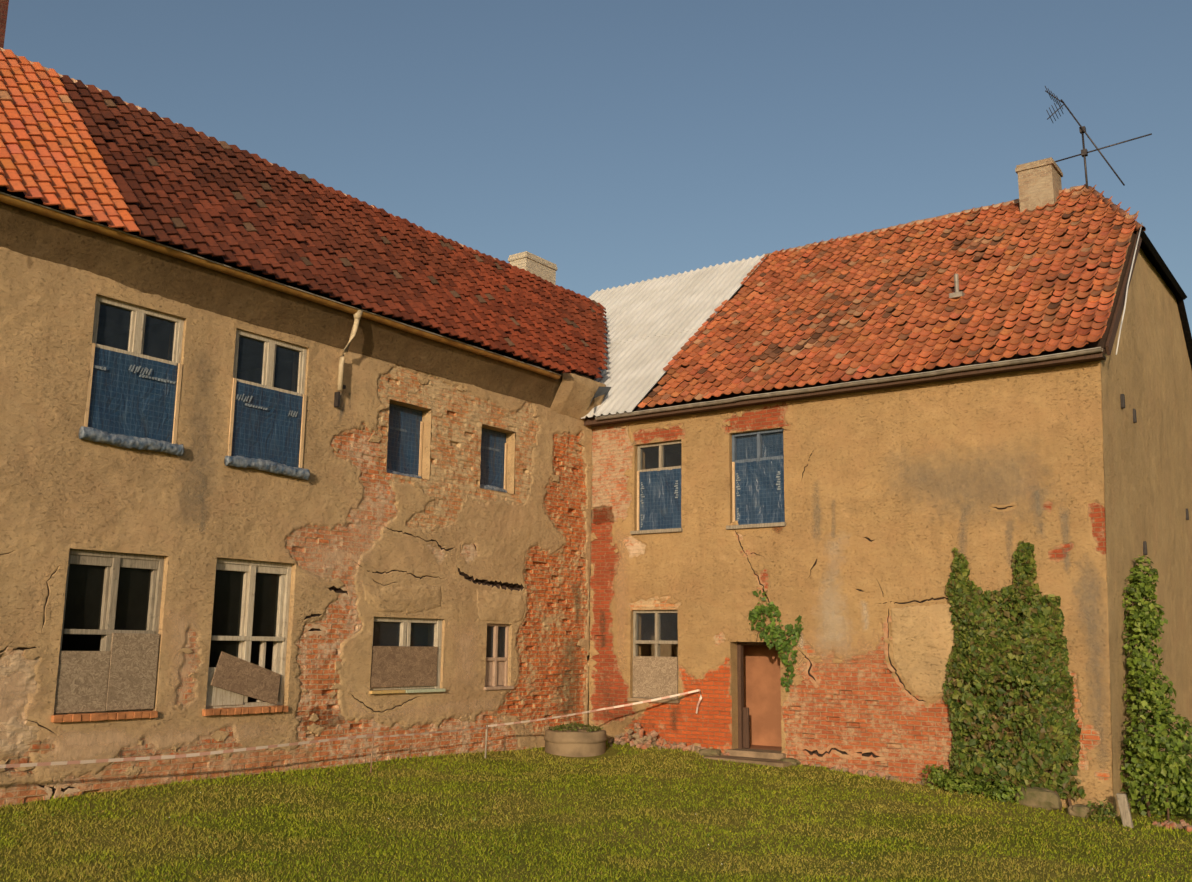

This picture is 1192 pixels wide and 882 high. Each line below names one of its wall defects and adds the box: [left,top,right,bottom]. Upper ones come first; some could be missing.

spalling [721,402,795,435]
crack [0,561,69,658]
spalling [0,364,732,807]
crack [730,521,783,620]
crack [803,554,821,583]
flaking render [1048,542,1074,563]
spalling [1088,501,1106,555]
crack [793,644,821,688]
crack [21,711,62,741]
spalling [782,623,969,785]